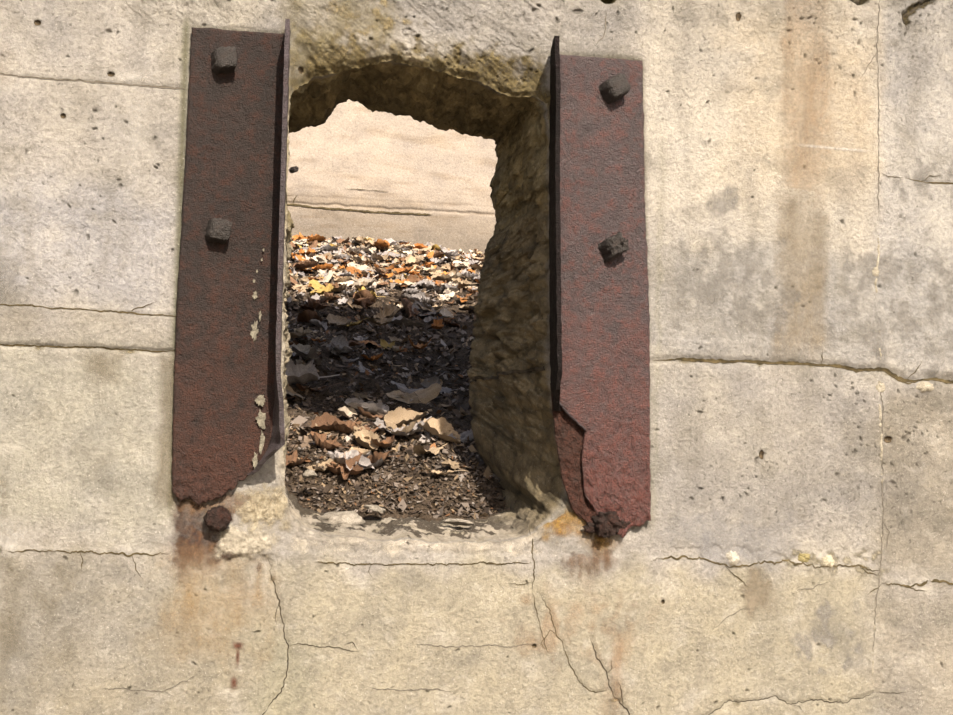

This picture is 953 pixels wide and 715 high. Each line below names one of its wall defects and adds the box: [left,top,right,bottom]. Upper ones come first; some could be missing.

spalling [902,0,933,29]
crack [0,73,187,90]
crack [865,1,953,205]
crack [0,302,176,317]
crack [0,344,175,352]
peeling [252,395,266,470]
crack [1,549,164,579]
corrosion [176,495,256,564]
corrosion [544,511,611,561]
crack [654,351,953,652]
crack [262,558,357,715]
crack [321,524,630,715]